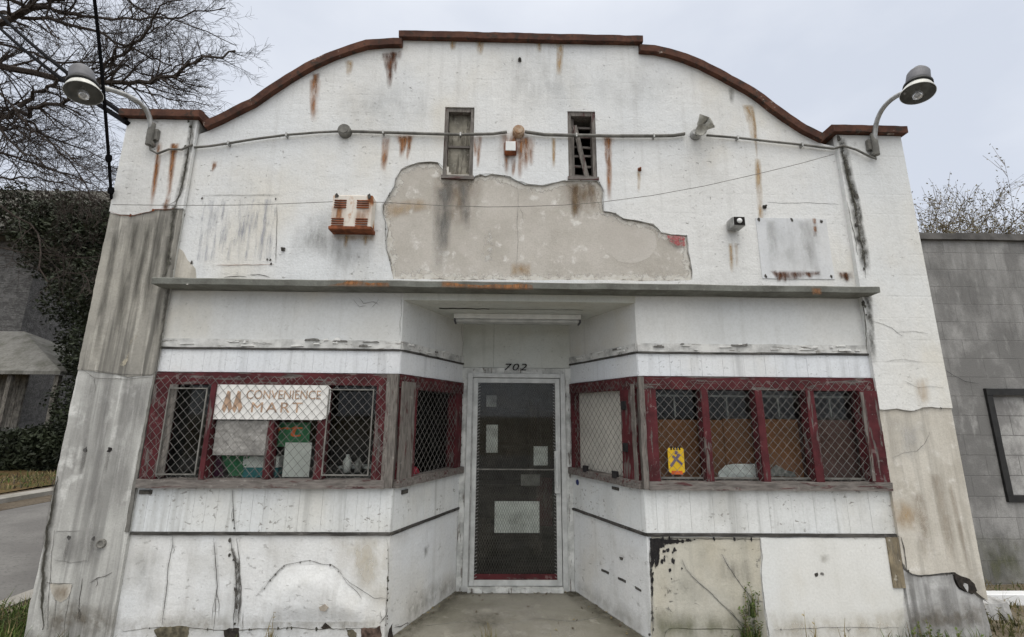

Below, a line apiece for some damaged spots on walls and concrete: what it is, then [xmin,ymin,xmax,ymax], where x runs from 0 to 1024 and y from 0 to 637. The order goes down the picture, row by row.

rust [387,53,396,79]
rust [152,145,176,193]
rust [505,137,531,171]
flaking render [383,162,692,281]
leakage [841,143,867,260]
peeling [291,337,347,347]
crack [804,135,978,455]
crack [189,491,409,632]
spalling [650,536,767,637]